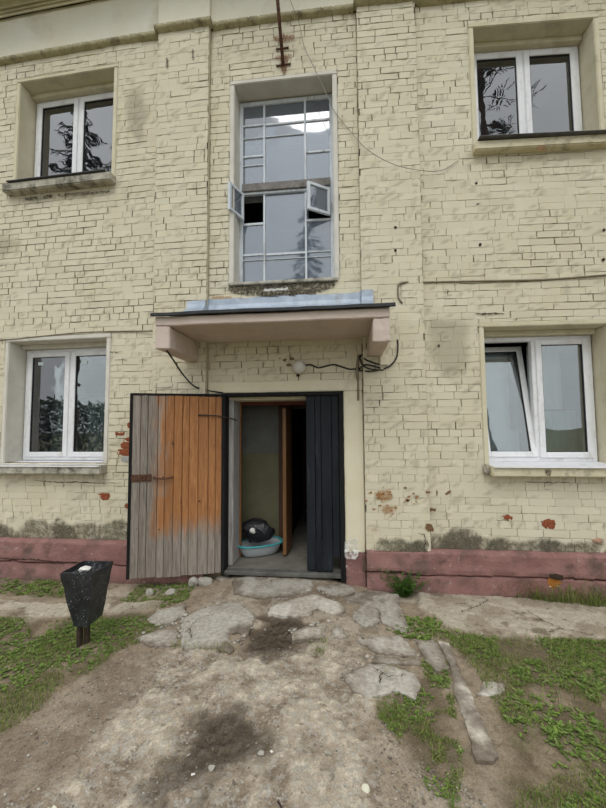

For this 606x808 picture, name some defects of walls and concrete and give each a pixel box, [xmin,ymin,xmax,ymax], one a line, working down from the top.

flaking render [115,423,129,456]
peeling [365,487,451,517]
damp [0,519,127,540]
flaking render [541,519,556,529]
damp [377,530,602,553]